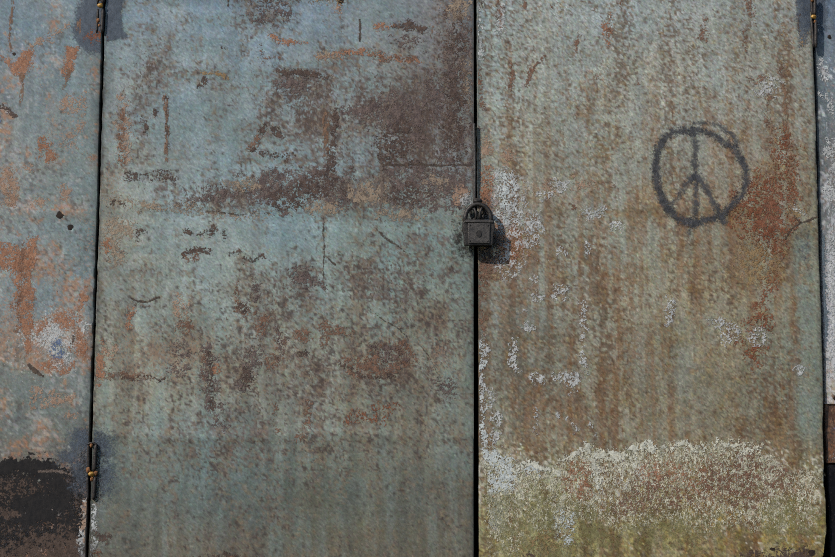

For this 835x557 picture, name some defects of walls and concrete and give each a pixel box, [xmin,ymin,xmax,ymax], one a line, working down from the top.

corrosion [0,1,71,103]
corrosion [0,46,92,211]
corrosion [99,0,483,266]
corrosion [524,54,547,87]
corrosion [722,45,806,373]
corrosion [0,235,91,375]
corrosion [95,292,231,432]
corrosion [233,277,354,393]
corrosion [285,262,328,291]
corrosion [338,338,418,379]
damp [526,509,578,555]
damp [754,493,819,548]